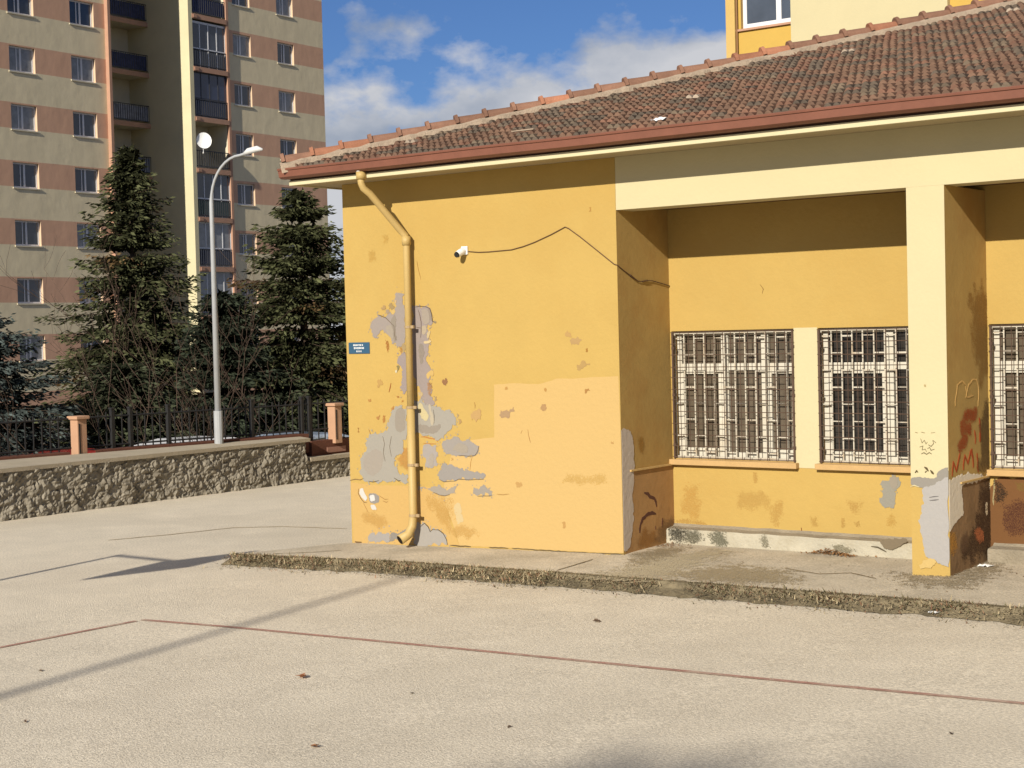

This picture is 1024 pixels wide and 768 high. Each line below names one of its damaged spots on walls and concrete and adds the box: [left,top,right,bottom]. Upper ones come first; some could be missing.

peeling [357,292,492,524]
peeling [879,475,901,508]
peeling [355,522,450,546]